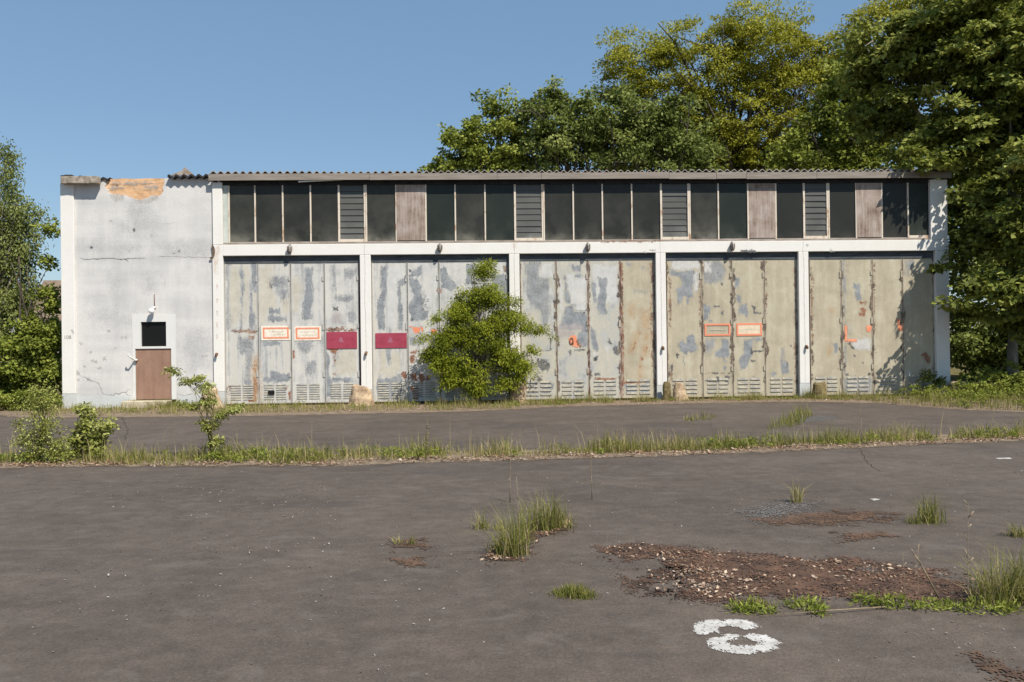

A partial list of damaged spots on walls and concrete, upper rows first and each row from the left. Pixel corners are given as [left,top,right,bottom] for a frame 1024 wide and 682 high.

spalling [105,178,164,204]
crack [81,254,210,262]
peeling [224,263,314,399]
peeling [295,340,359,398]
peeling [330,266,358,325]
corrosion [401,350,430,403]
peeling [375,262,473,346]
peeling [492,273,507,298]
corrosion [593,262,655,397]
peeling [520,249,814,397]
peeling [829,249,877,395]
peeling [899,259,915,379]